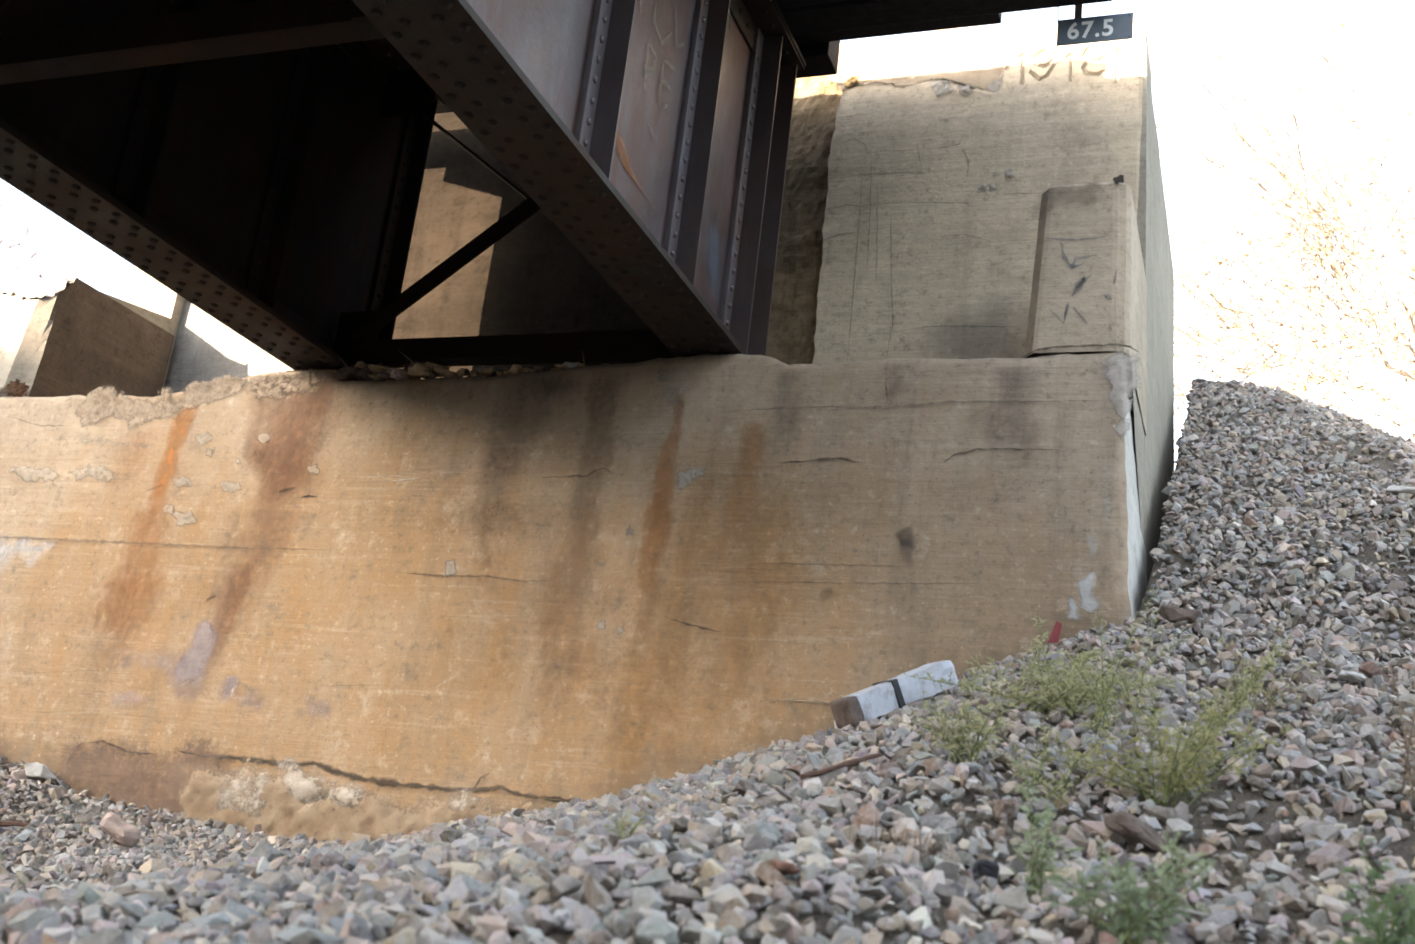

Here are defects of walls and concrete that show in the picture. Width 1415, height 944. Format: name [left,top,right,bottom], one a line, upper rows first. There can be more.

crack [838,70,907,86]
spalling [76,368,324,443]
corrosion [154,405,197,501]
crack [783,456,855,464]
crack [945,448,1054,462]
crack [64,741,572,802]